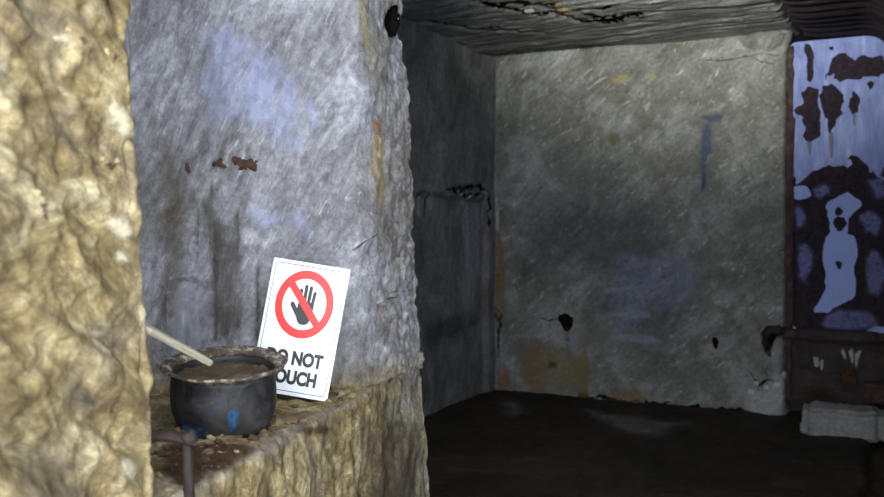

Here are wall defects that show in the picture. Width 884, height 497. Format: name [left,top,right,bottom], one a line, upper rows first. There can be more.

crack [419,0,645,31]